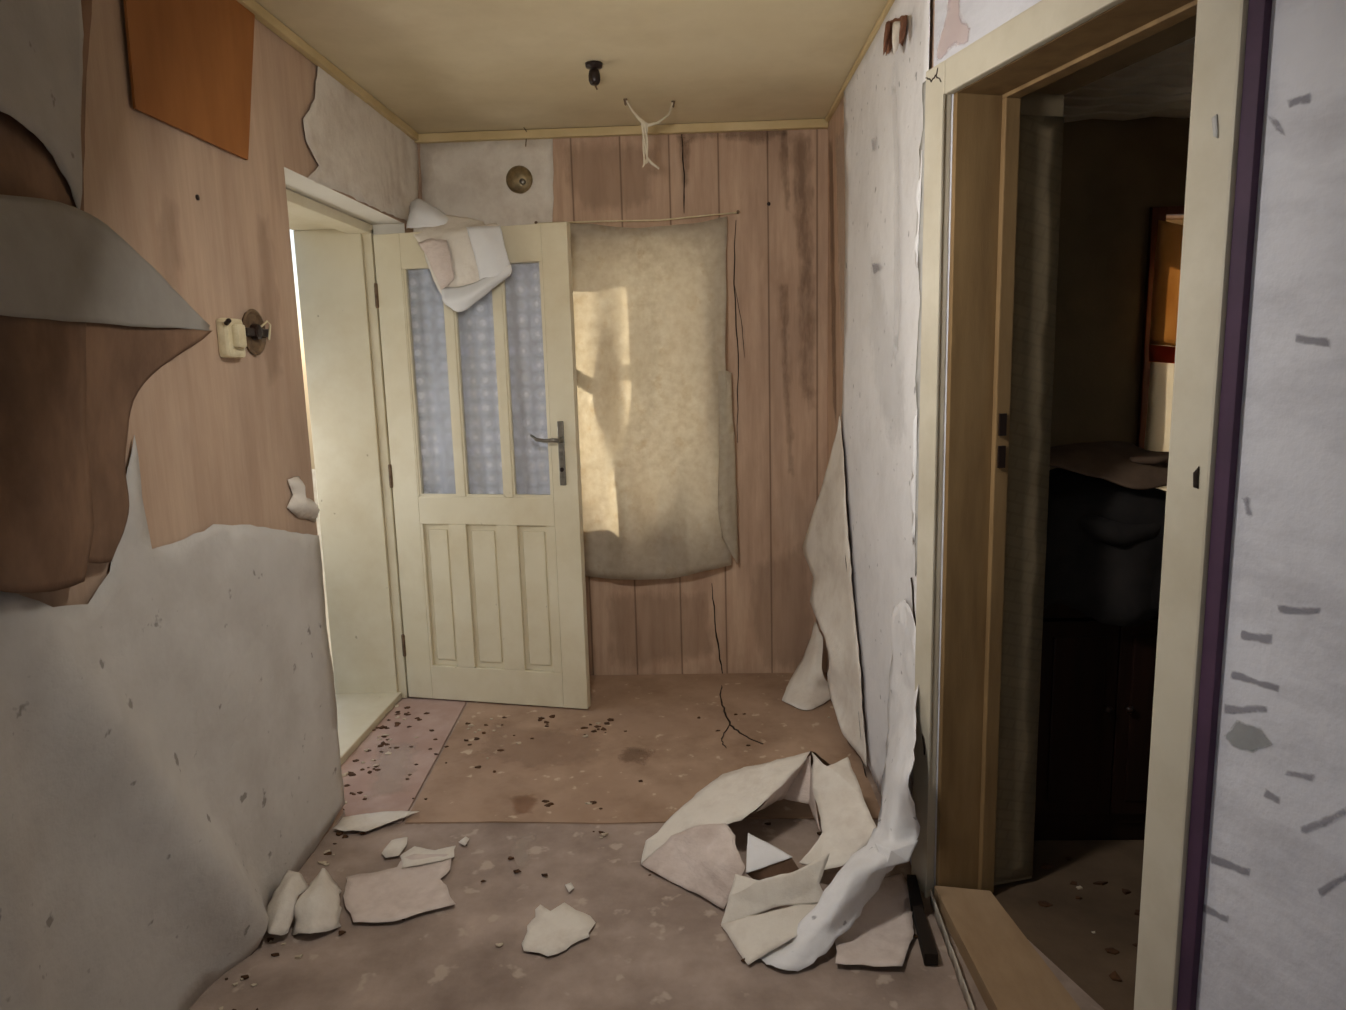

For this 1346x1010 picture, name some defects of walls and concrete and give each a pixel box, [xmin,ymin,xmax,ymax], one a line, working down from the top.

peeling [287,476,320,522]